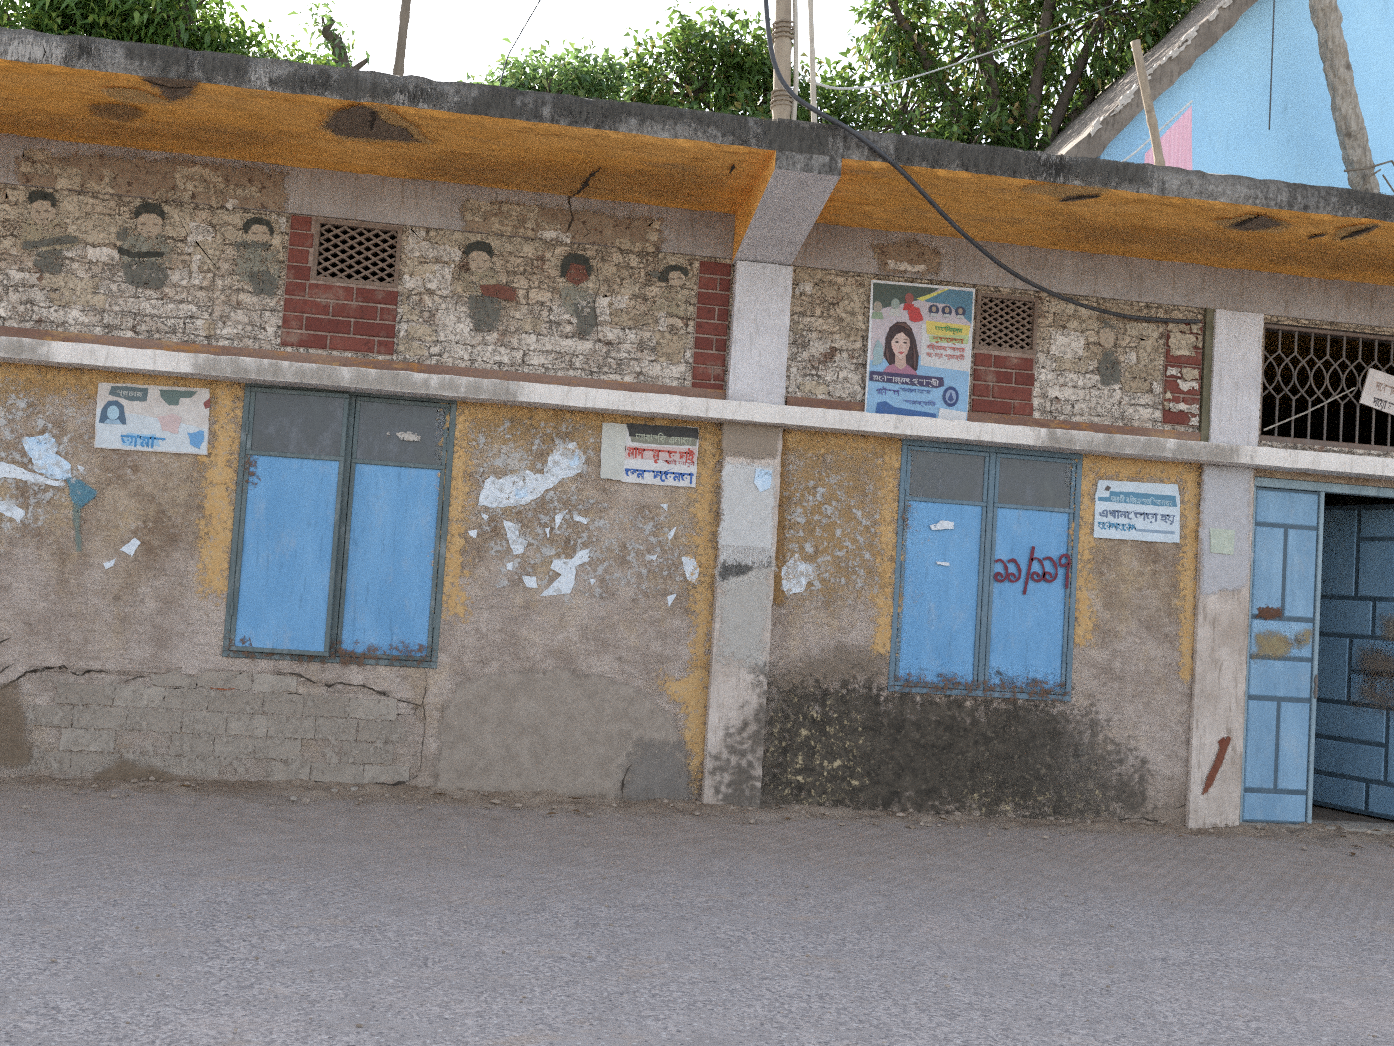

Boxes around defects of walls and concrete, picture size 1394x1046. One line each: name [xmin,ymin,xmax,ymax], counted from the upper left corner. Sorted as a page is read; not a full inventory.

crack [567,167,601,352]
peeling [1037,301,1203,426]
peeling [0,362,245,606]
rust [235,454,261,490]
spalling [0,670,415,792]
rust [219,635,438,673]
peeling [428,401,904,793]
damp [709,649,1156,822]
rust [888,671,1071,706]
rust [1202,737,1231,795]
rust [1254,606,1312,658]